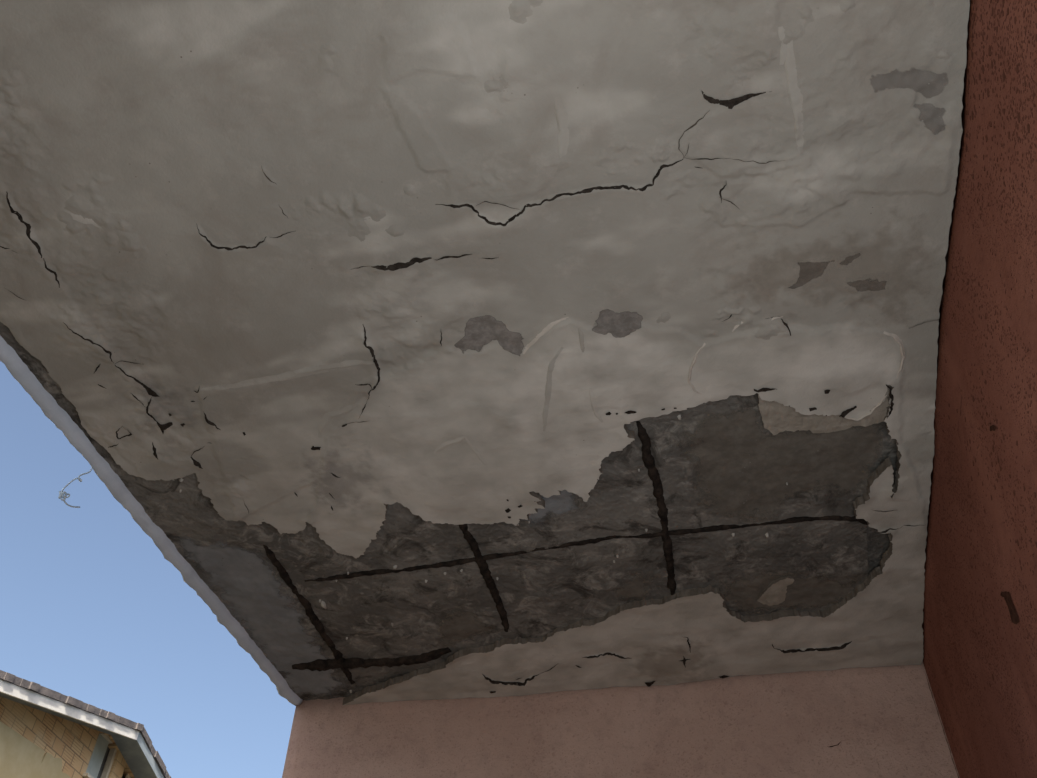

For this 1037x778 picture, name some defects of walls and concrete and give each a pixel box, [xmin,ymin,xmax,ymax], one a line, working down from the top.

crack [435,110,785,226]
crack [196,169,294,250]
crack [0,193,60,288]
crack [354,254,498,271]
peeling [789,253,860,289]
peeling [847,279,886,291]
peeling [592,309,643,338]
crack [347,325,380,424]
spalling [0,316,891,700]
crack [772,641,852,653]
crack [482,652,632,686]